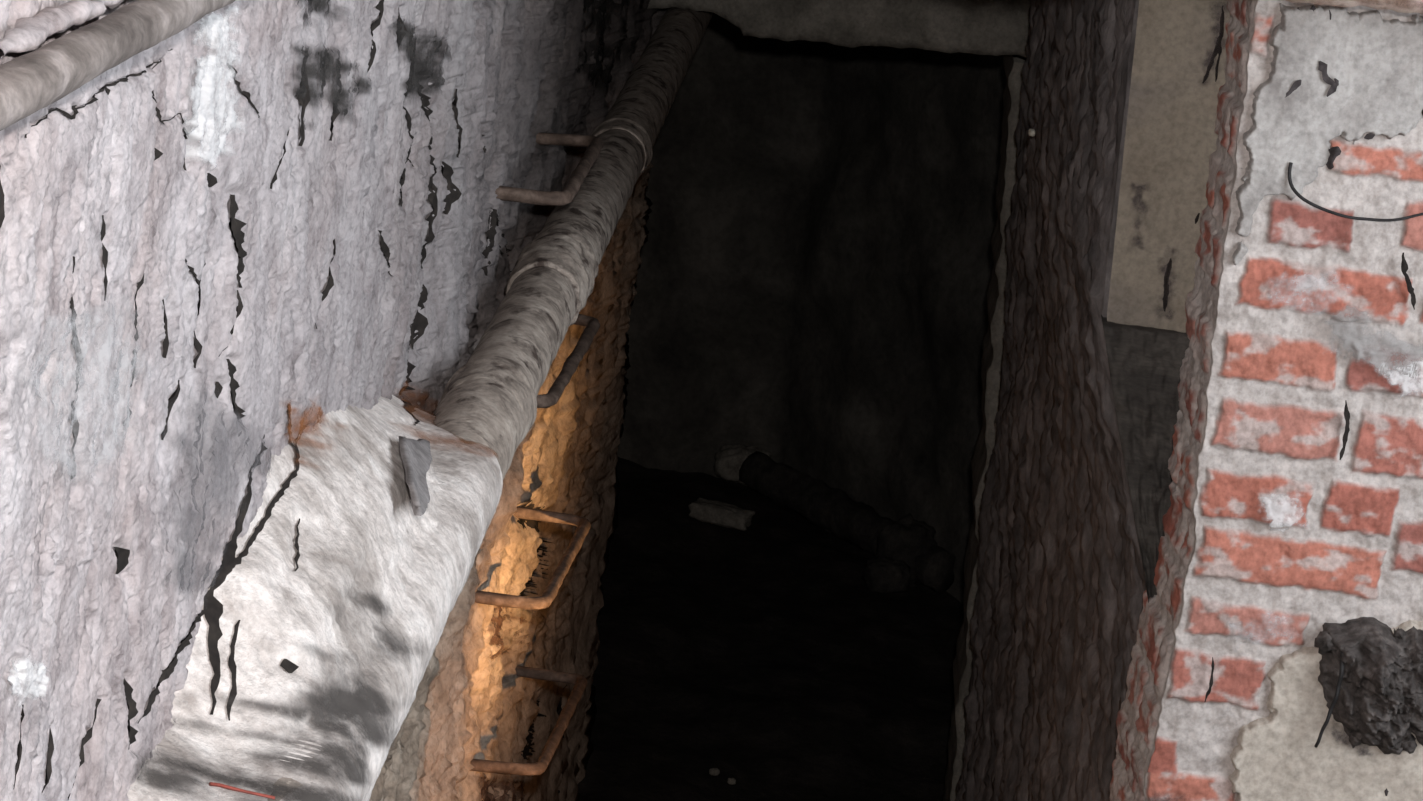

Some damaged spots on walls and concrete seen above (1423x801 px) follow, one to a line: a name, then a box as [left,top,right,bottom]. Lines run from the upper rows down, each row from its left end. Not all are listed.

spalling [1286,79,1302,97]
spalling [1318,61,1339,97]
spalling [1326,146,1341,169]
crack [0,165,8,228]
crack [1401,253,1416,310]
crack [1340,400,1350,460]
peeling [399,436,432,516]
crack [138,404,307,723]